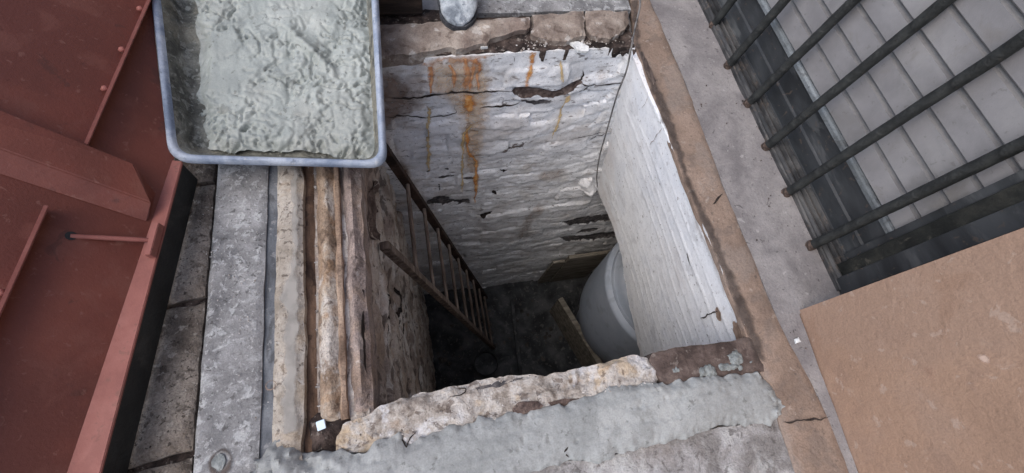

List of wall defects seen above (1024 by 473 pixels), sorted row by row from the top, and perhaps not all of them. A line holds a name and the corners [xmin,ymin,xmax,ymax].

corrosion [424,57,485,112]
spalling [512,79,583,105]
corrosion [461,126,479,202]
peeling [427,168,474,205]
peeling [561,214,615,241]
crack [786,416,830,424]